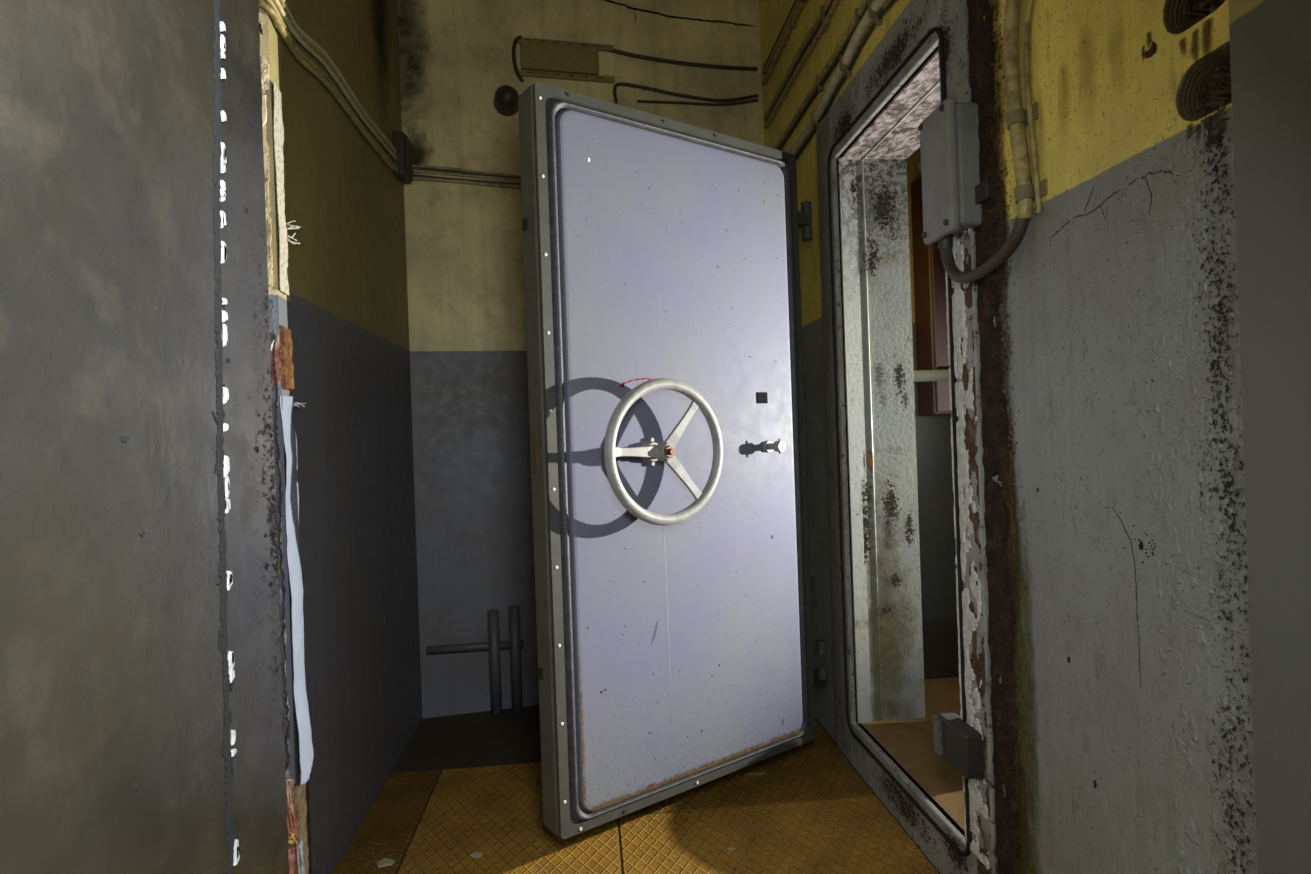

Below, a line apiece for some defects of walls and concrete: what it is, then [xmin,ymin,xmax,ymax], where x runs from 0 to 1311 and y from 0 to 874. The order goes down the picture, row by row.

crack [211,0,290,874]
rust [271,325,294,406]
peeling [254,55,314,874]
crack [604,0,757,27]
rust [824,0,1035,874]
crack [1050,156,1179,238]